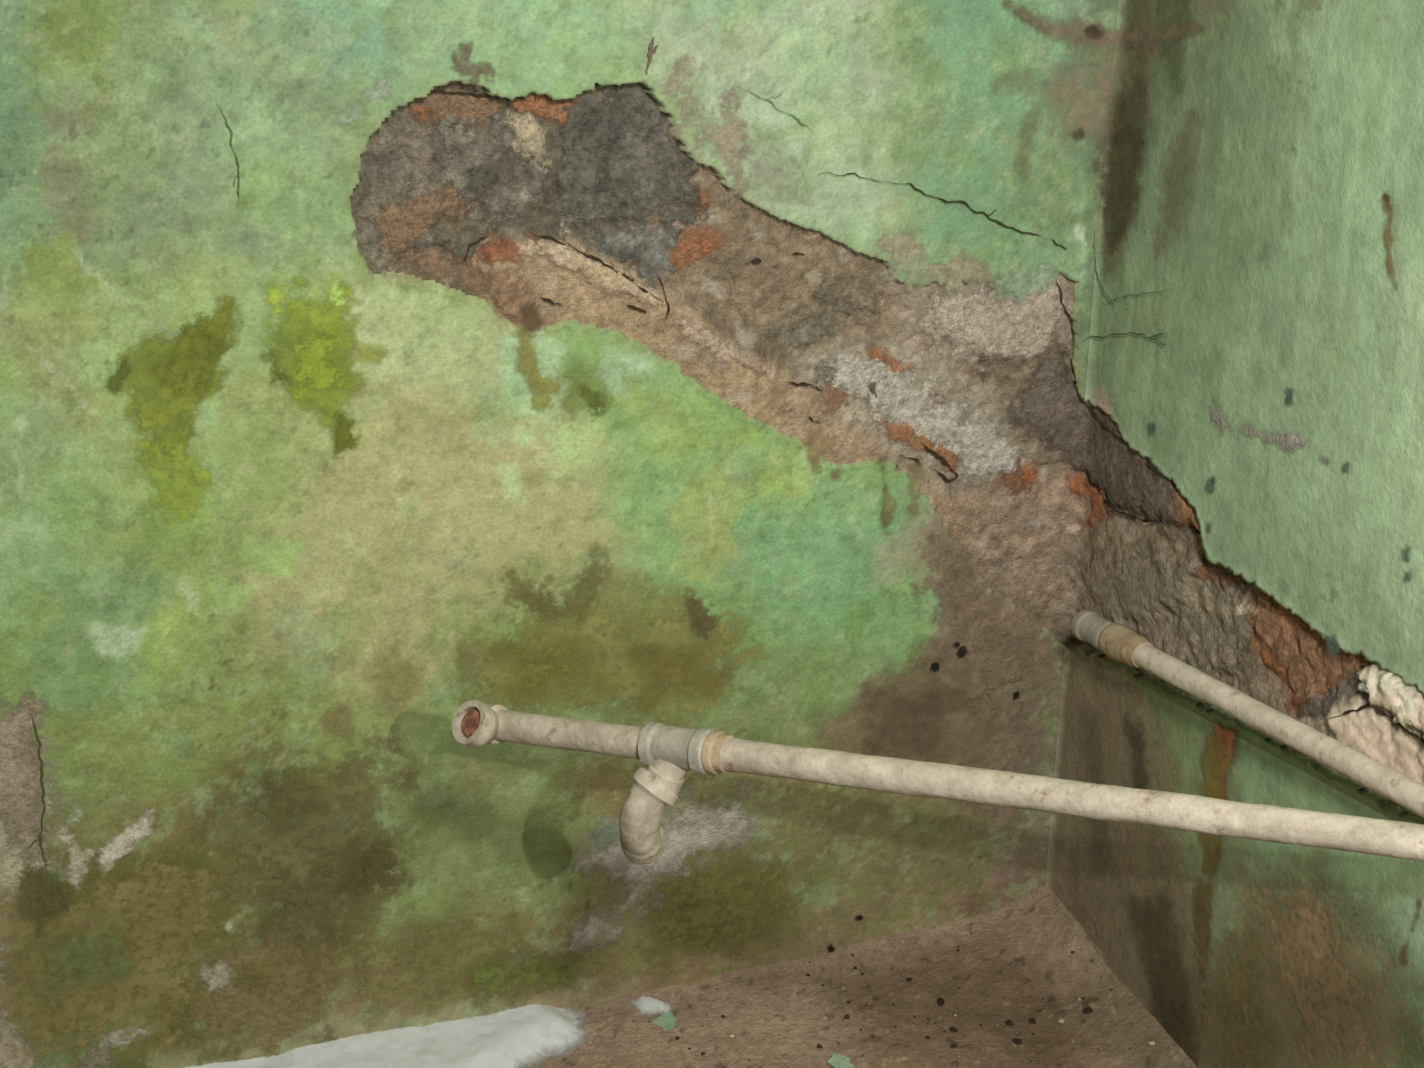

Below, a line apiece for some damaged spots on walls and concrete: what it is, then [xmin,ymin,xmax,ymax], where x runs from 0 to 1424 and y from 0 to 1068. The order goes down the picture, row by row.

crack [740,87,811,130]
leakage [1004,0,1225,268]
crack [819,172,1169,346]
leakage [335,415,354,453]
spalling [336,44,1424,785]
peeling [0,692,154,1068]
leakage [201,735,418,950]
leakage [458,546,766,729]
leakage [471,787,787,1000]
leakage [1061,680,1175,791]
leakage [1073,818,1424,1068]
spalling [1373,791,1419,816]